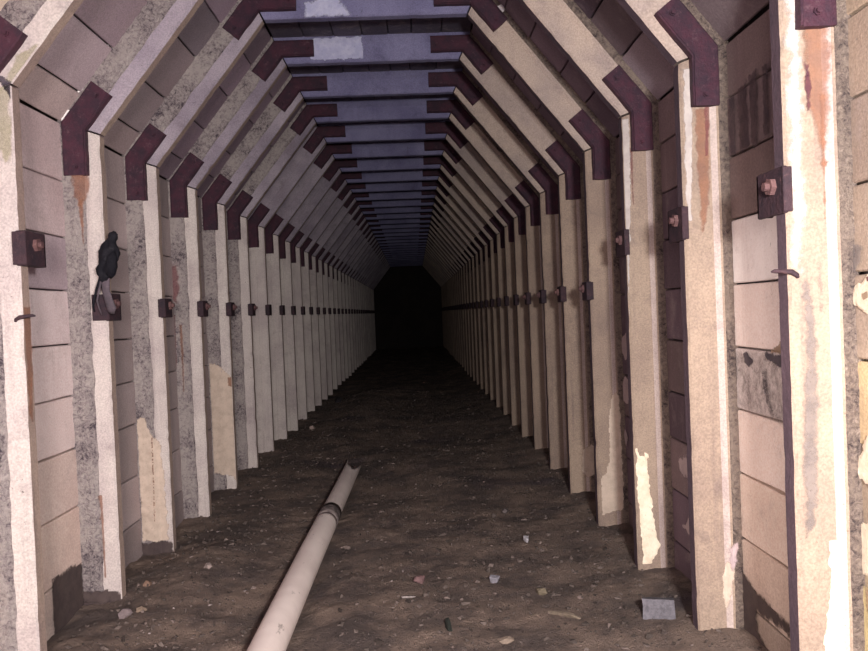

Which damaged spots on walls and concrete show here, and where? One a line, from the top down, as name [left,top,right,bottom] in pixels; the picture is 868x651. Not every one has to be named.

water stain [728,64,769,155]
corrosion [803,28,831,167]
corrosion [72,175,89,242]
corrosion [695,109,709,230]
peeling [853,274,868,314]
water stain [739,342,782,421]
peeling [582,376,661,564]
peeling [858,436,868,484]
water stain [742,572,790,647]
peeling [823,540,846,651]